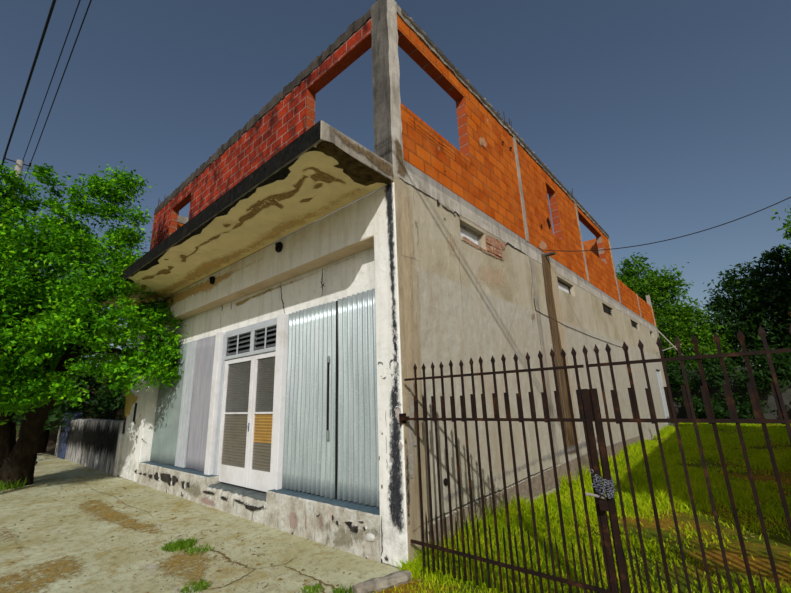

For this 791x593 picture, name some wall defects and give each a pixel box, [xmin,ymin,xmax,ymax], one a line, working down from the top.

peeling [140,165,348,289]
flaking render [461,235,505,261]
leakage [98,120,422,531]
flaking render [134,469,189,497]
flaking render [202,490,266,512]
flaking render [332,515,367,534]